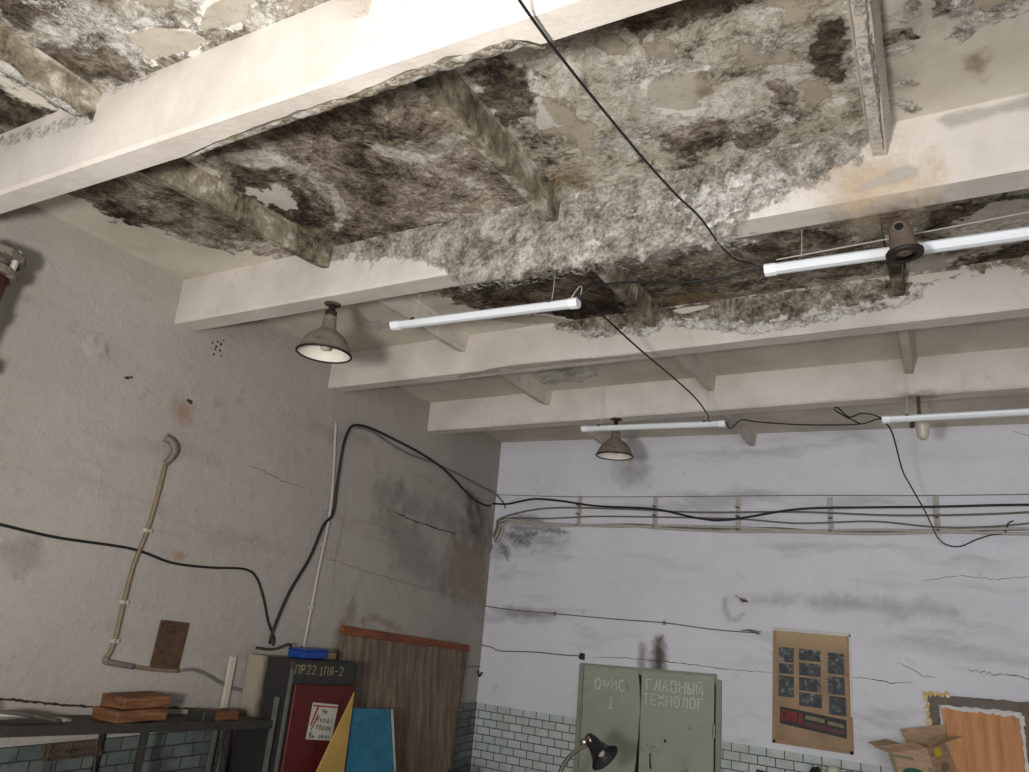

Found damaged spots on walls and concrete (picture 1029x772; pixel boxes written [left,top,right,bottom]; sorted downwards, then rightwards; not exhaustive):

peeling [109,0,326,67]
peeling [591,31,714,117]
spalling [186,39,545,159]
peeling [943,98,1029,124]
peeling [949,199,1029,235]
peeling [906,253,953,273]
crack [332,500,480,605]
crack [922,574,1029,582]
crack [969,670,1029,680]